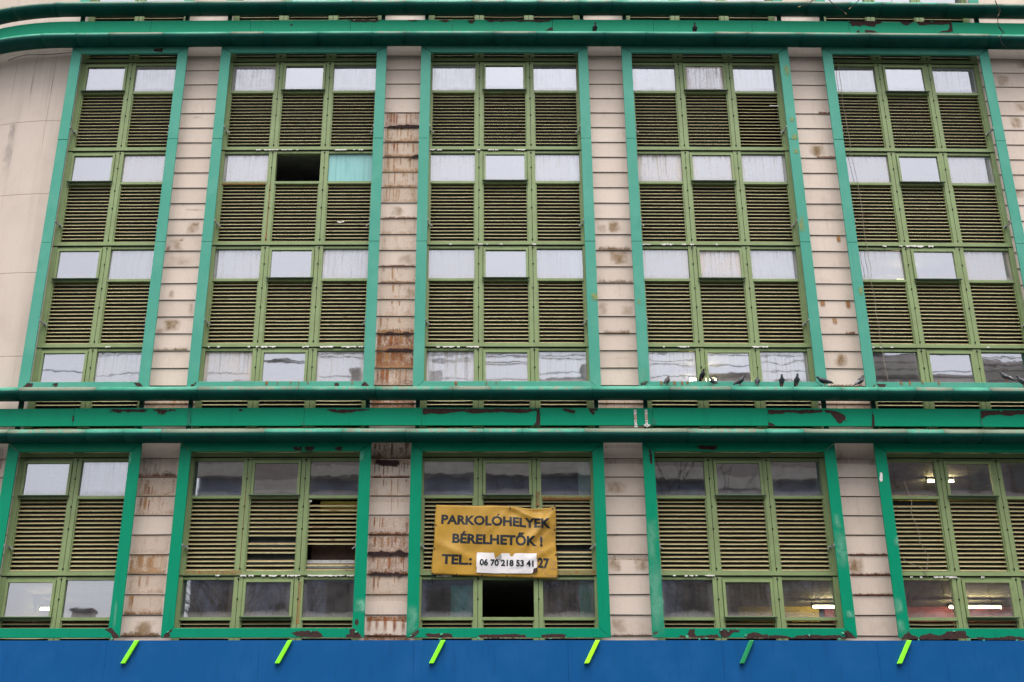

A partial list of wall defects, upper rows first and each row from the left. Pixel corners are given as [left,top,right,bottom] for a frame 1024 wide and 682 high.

peeling [849,21,882,33]
peeling [901,21,953,33]
corrosion [383,113,419,218]
corrosion [375,264,415,386]
peeling [423,408,540,425]
peeling [768,409,847,426]
corrosion [371,443,411,491]
corrosion [367,517,408,587]
corrosion [364,616,409,640]
peeling [679,629,856,640]
peeling [901,631,1024,641]